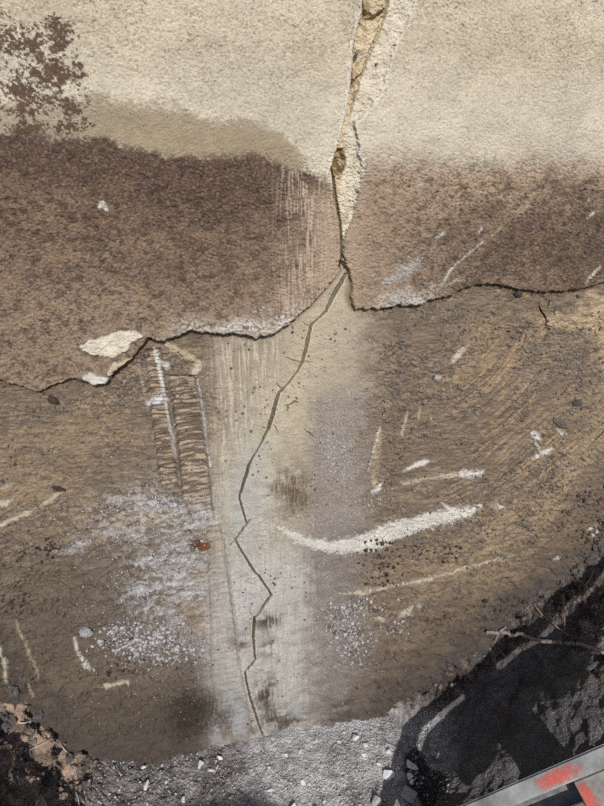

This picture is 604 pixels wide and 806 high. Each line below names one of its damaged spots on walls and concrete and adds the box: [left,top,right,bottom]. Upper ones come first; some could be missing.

water stain [0,12,301,168]
water stain [383,258,421,300]
flaking render [212,306,278,335]
flaking render [79,330,143,385]
crack [228,0,420,737]